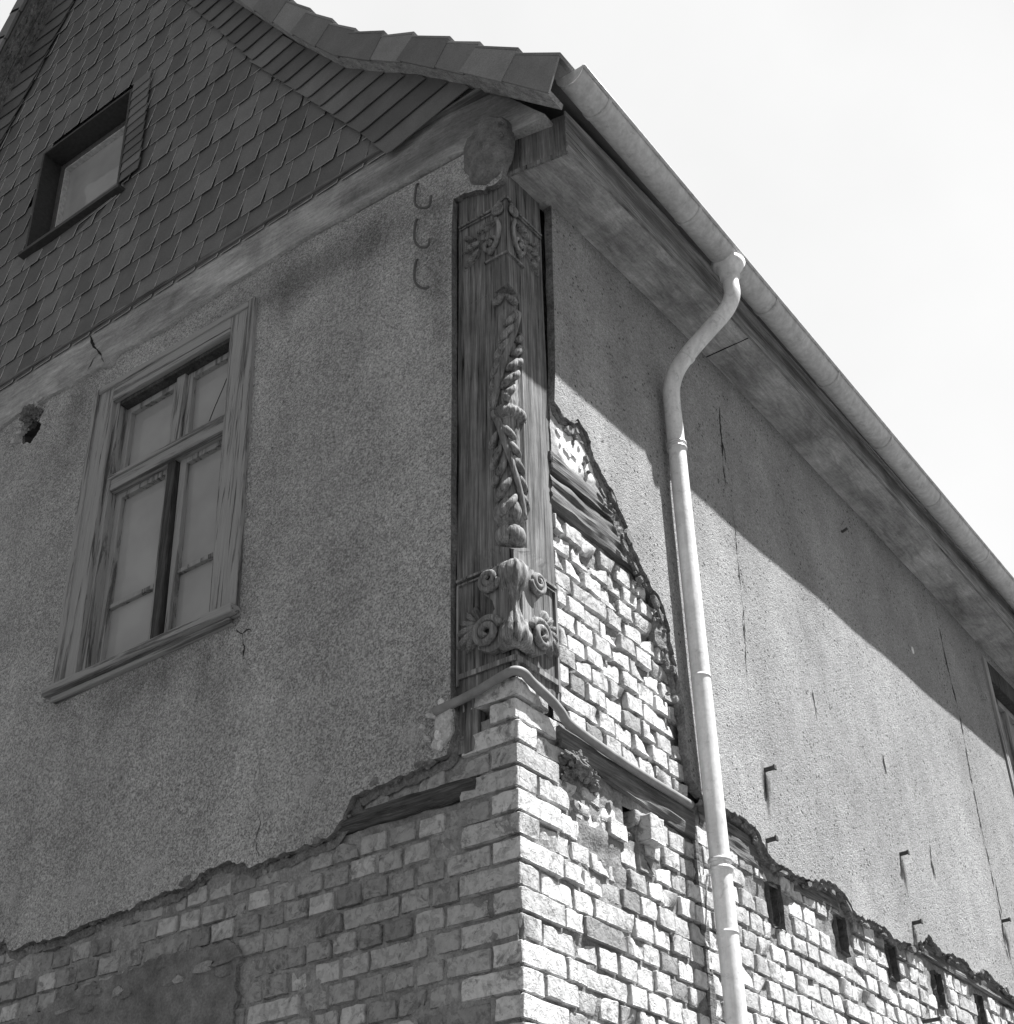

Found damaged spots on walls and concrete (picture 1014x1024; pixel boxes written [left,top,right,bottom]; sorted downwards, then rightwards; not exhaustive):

crack [88,335,104,369]
spalling [10,397,44,446]
spalling [548,402,680,716]
spalling [556,748,617,823]
crack [935,607,1014,972]
spalling [0,695,464,960]
spalling [725,812,1014,1001]
spalling [930,970,948,1010]
spalling [973,994,987,1024]